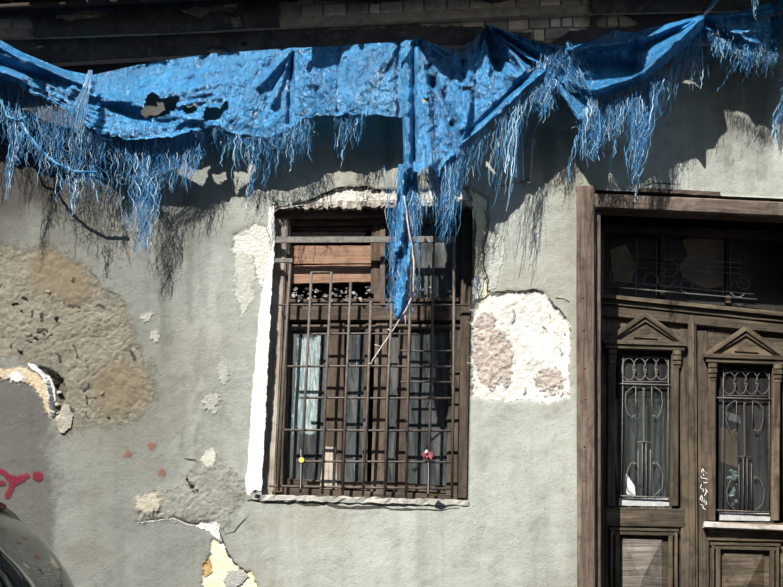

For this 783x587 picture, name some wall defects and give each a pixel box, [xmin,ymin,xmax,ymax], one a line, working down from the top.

flaking render [275,187,397,212]
flaking render [0,241,158,433]
peeling [230,223,271,317]
flaking render [414,188,572,404]
crack [494,289,571,336]
peeling [195,521,258,587]